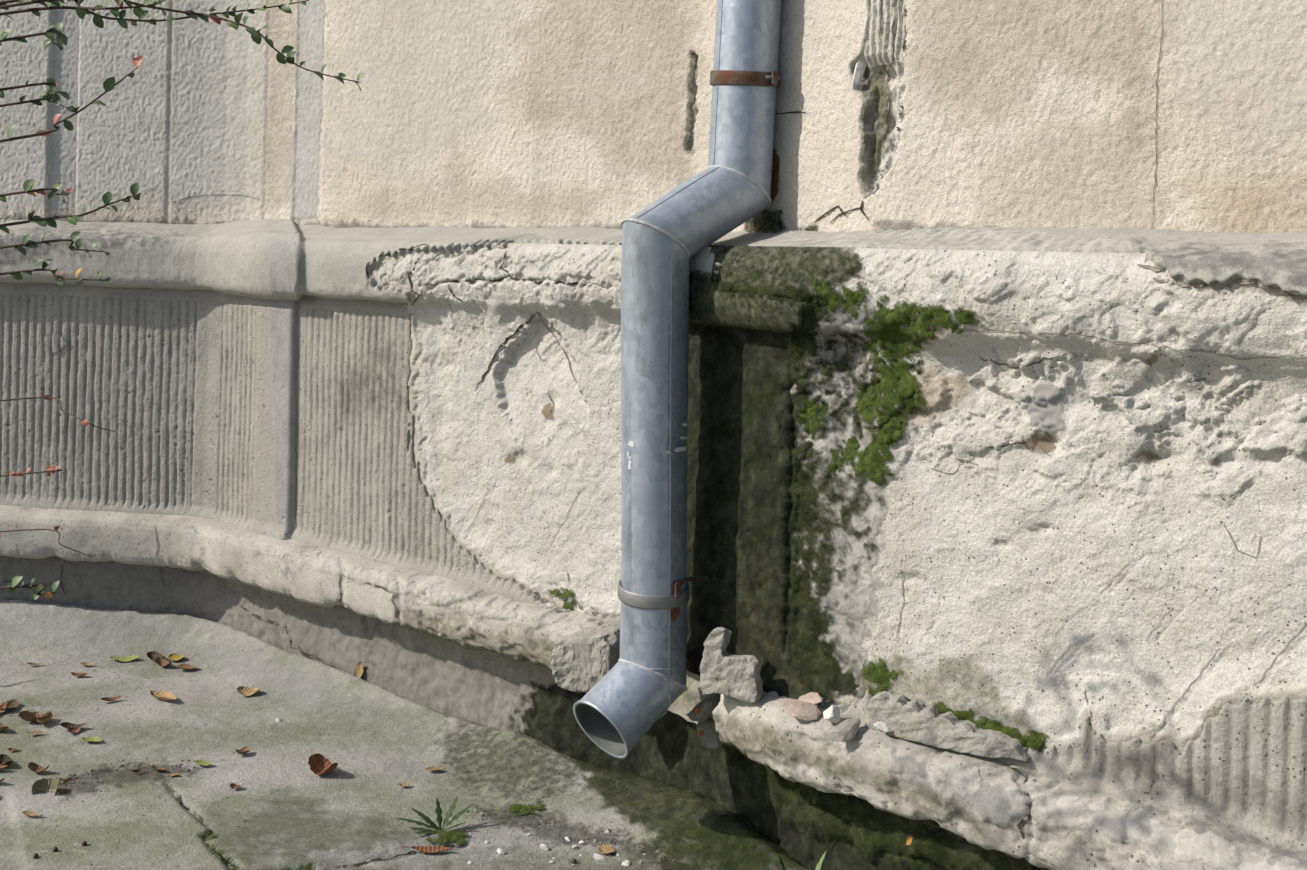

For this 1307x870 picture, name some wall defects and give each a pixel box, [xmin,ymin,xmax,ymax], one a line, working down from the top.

flaking render [851,0,907,197]
crack [366,244,596,414]
flaking render [368,242,622,616]
flaking render [778,227,1307,803]
crack [335,845,459,868]
damp [509,682,978,870]
damp [902,756,1020,827]
peeling [1005,778,1307,870]